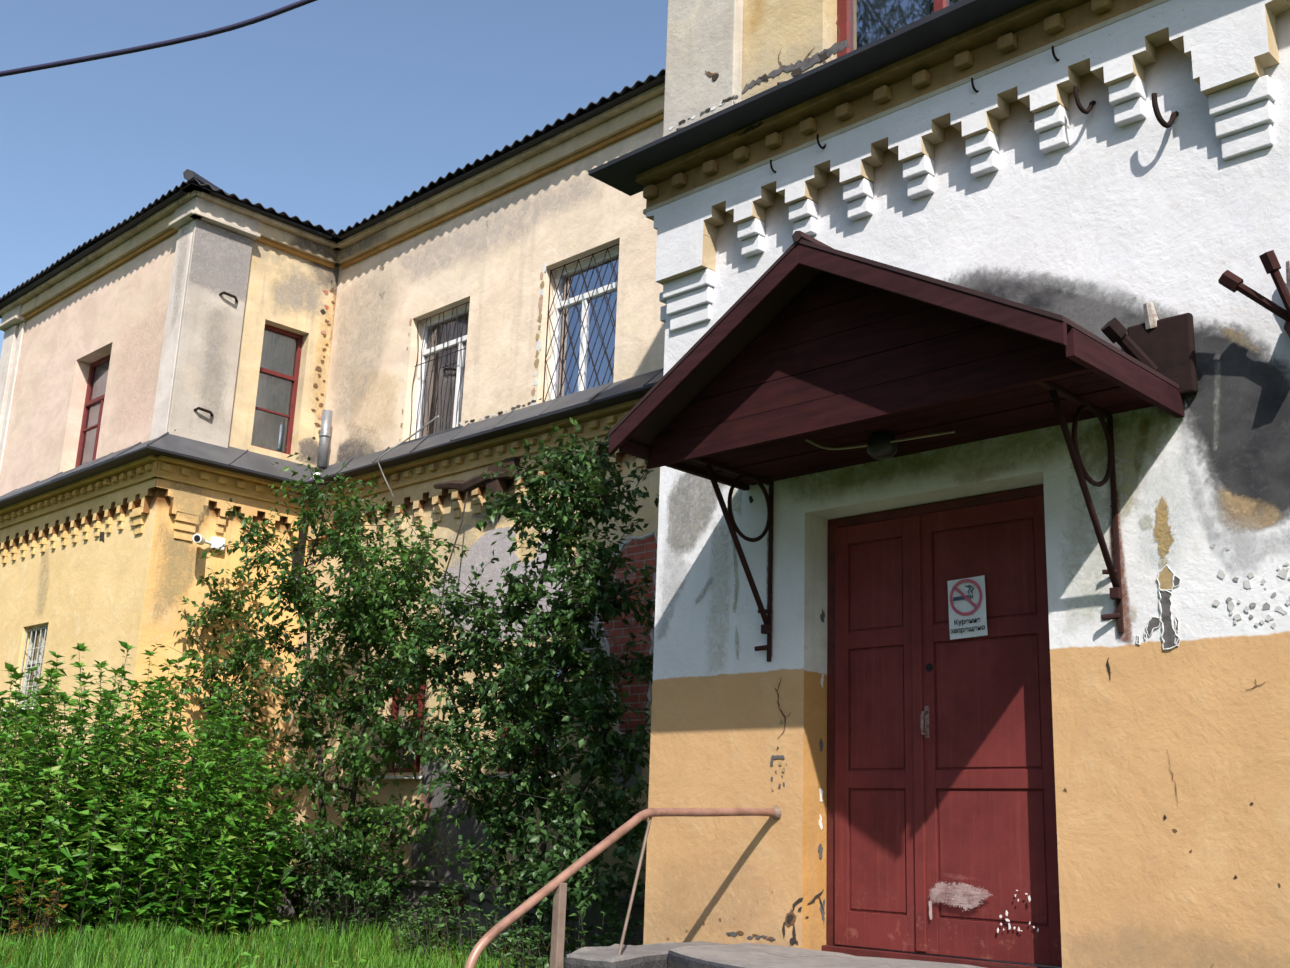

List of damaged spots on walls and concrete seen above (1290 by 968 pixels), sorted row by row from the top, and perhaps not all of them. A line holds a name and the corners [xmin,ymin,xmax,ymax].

leakage [953,270,1168,353]
leakage [794,425,1062,489]
leakage [1078,406,1170,513]
leakage [1183,323,1290,567]
leakage [659,473,741,637]
peeling [1136,497,1181,650]
peeling [1212,562,1290,628]
crack [774,676,790,738]
peeling [770,746,787,791]
flaking render [686,897,803,945]